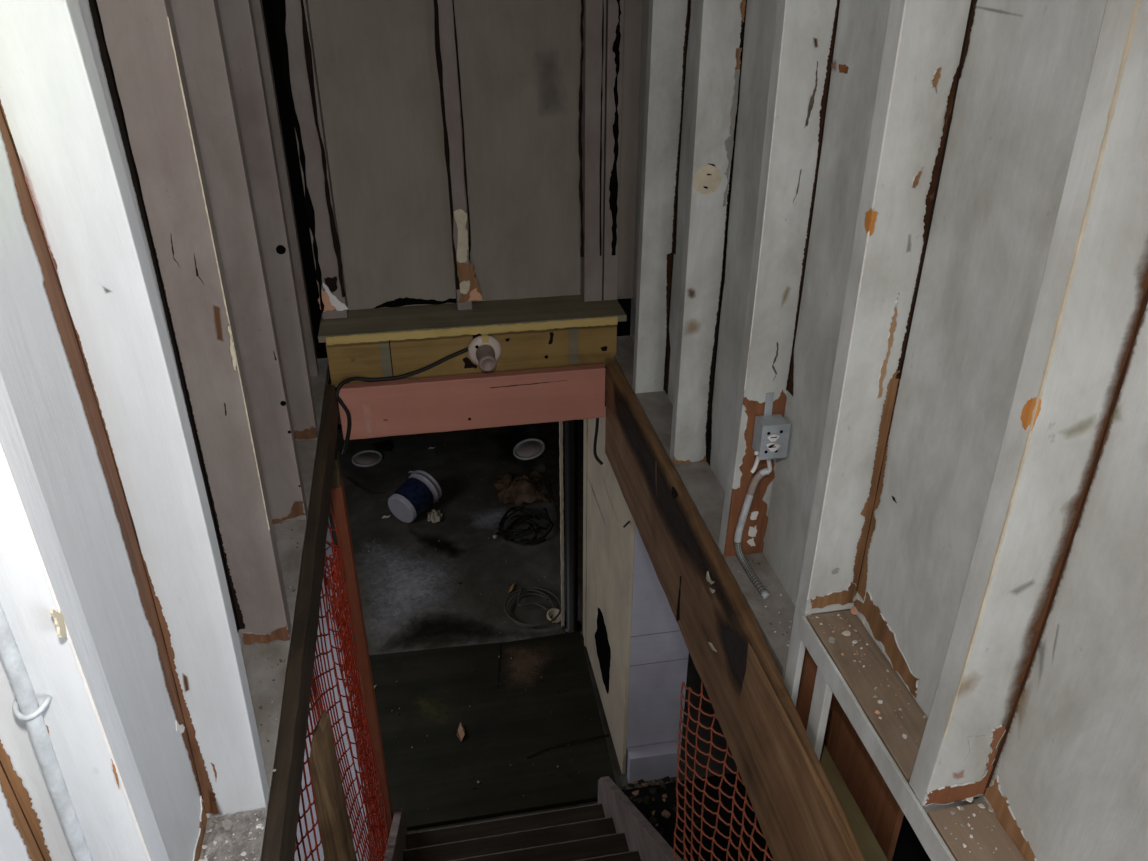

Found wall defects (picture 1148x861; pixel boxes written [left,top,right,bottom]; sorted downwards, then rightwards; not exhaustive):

peeling [865,208,878,236]
peeling [457,261,482,303]
peeling [876,293,900,399]
crack [852,0,977,600]
peeling [1020,397,1041,431]
peeling [723,388,787,558]
peeling [50,609,67,638]
peeling [810,582,920,698]
peeling [924,724,1037,861]